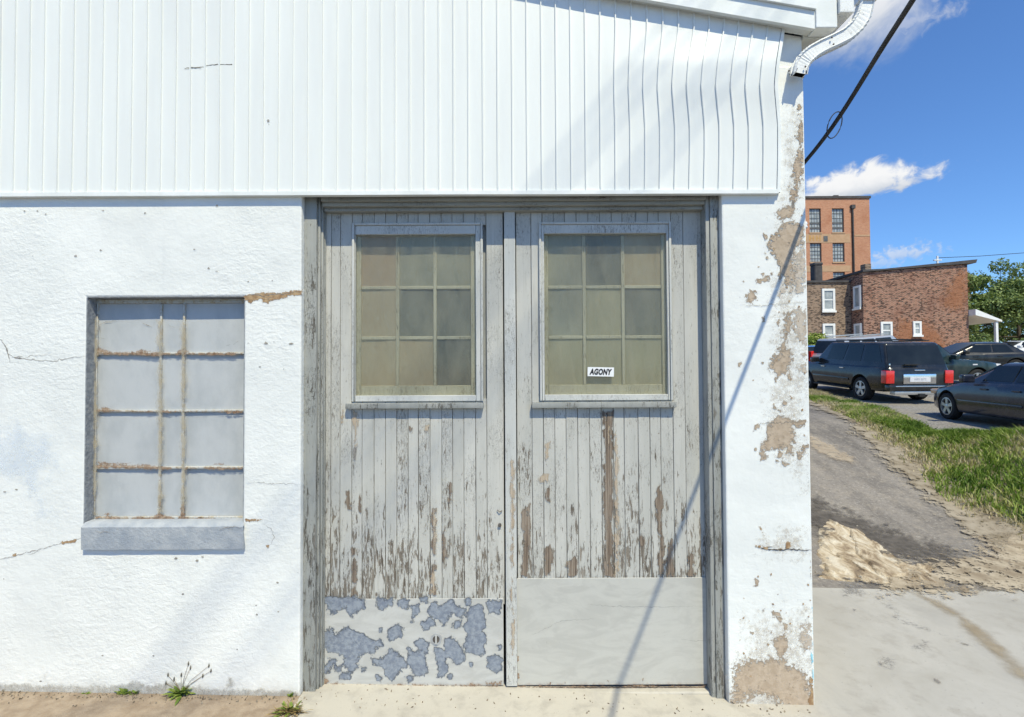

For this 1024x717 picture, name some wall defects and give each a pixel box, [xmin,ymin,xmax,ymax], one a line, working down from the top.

spalling [743,104,808,383]
spalling [244,280,303,304]
crack [0,320,116,362]
rust [93,320,243,519]
peeling [753,395,809,466]
peeling [325,595,504,684]
spalling [729,594,813,705]